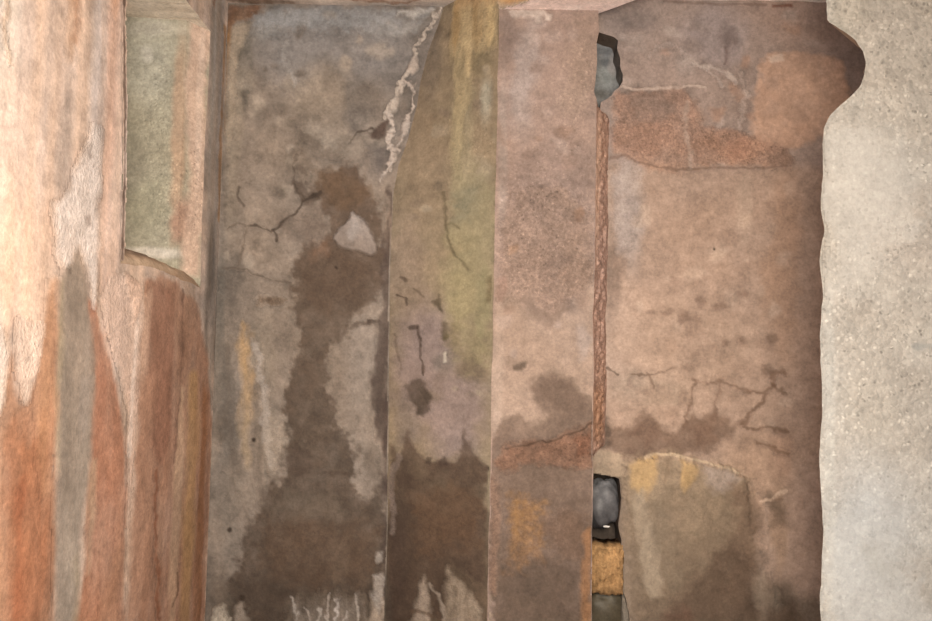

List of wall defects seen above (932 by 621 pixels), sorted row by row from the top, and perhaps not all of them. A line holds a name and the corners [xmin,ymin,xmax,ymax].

corrosion [0,274,59,621]
corrosion [81,270,213,621]
crack [220,152,323,286]
leakage [210,0,593,621]
crack [605,365,792,457]